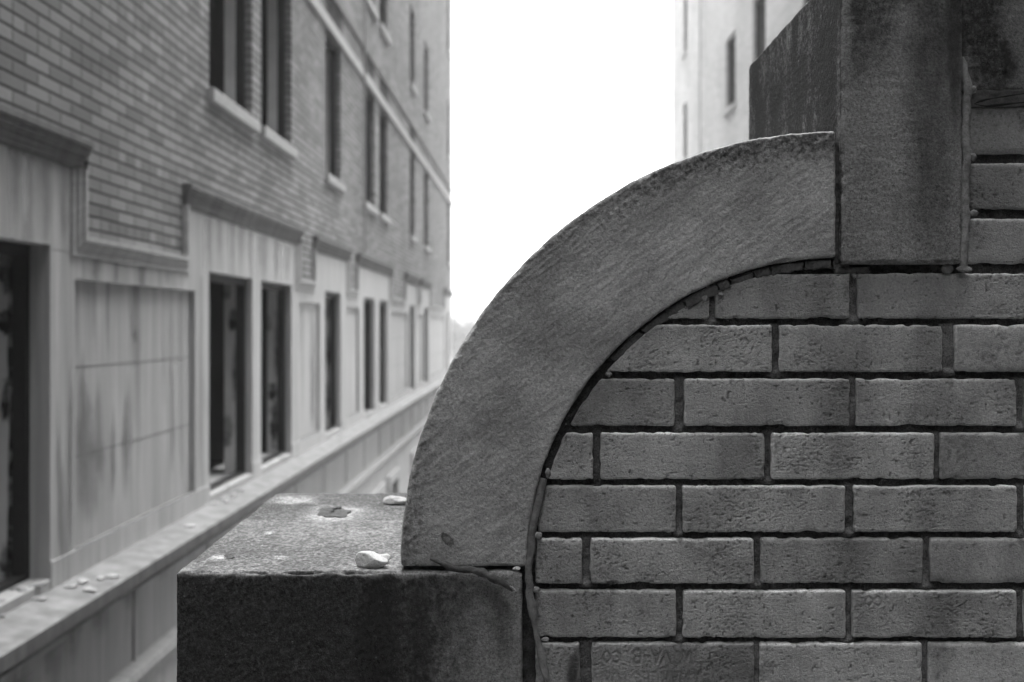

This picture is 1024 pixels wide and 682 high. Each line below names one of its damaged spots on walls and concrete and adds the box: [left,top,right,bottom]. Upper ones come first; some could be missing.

water stain [70,392,94,507]